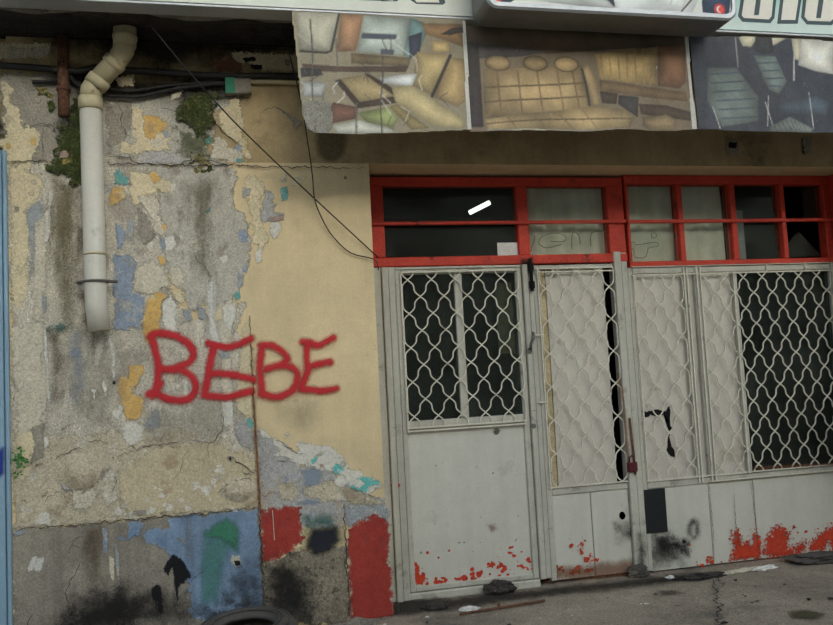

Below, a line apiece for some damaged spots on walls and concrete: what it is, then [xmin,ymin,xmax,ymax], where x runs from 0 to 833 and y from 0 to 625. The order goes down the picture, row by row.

peeling [0,41,52,61]
peeling [230,51,298,73]
crack [109,108,364,169]
flaking render [0,71,385,625]
crack [13,317,298,606]
peeling [696,522,833,567]
crack [712,569,726,625]